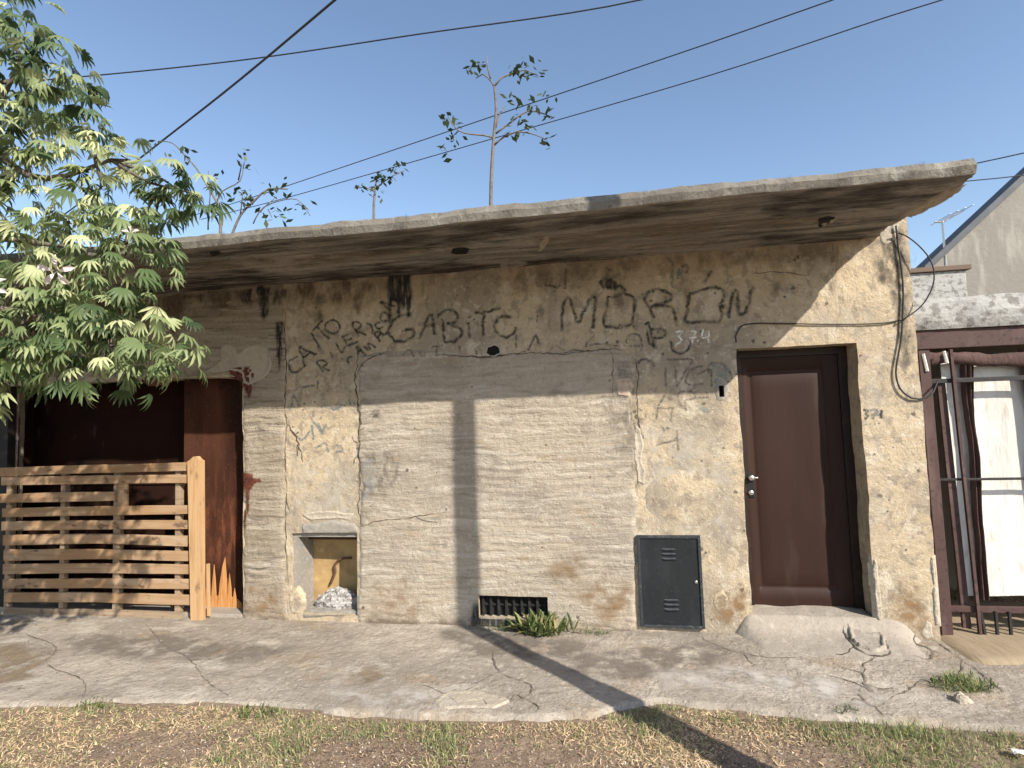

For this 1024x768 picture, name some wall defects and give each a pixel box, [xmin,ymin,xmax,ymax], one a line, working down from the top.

water stain [96,212,720,366]
water stain [763,185,927,315]
rust [237,366,254,397]
crack [352,353,437,527]
rust [205,473,261,564]
crack [838,627,891,657]